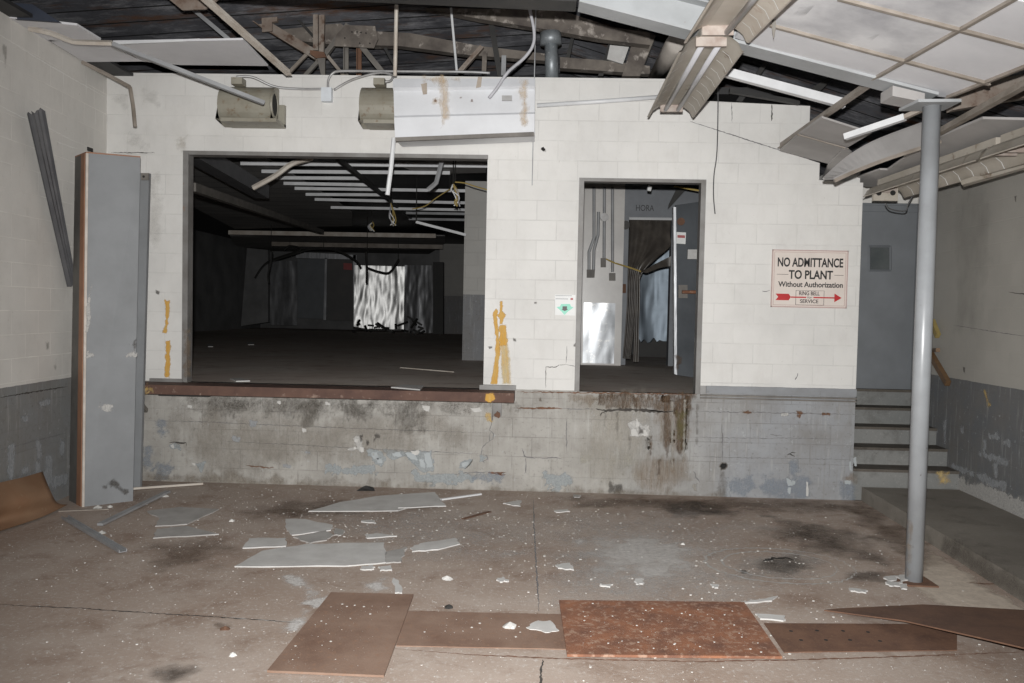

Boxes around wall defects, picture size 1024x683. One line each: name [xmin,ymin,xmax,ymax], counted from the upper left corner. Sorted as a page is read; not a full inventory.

peeling [348,436,434,473]
peeling [628,419,650,437]
crack [532,500,540,614]
damp [703,525,878,585]